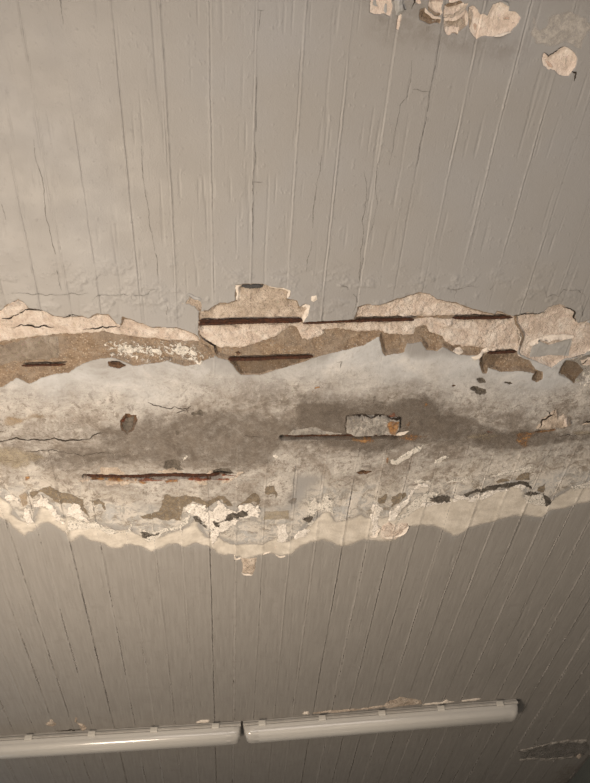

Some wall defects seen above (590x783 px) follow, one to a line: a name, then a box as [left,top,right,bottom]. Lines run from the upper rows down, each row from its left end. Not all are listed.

peeling [370,0,402,30]
peeling [412,0,521,39]
peeling [542,47,577,81]
crack [252,153,261,237]
crack [341,35,442,317]
crack [22,139,158,300]
spalling [0,284,590,395]
crack [0,431,110,462]
spalling [120,413,138,434]
spalling [284,414,411,440]
leakage [297,399,561,465]
spalling [80,459,243,486]